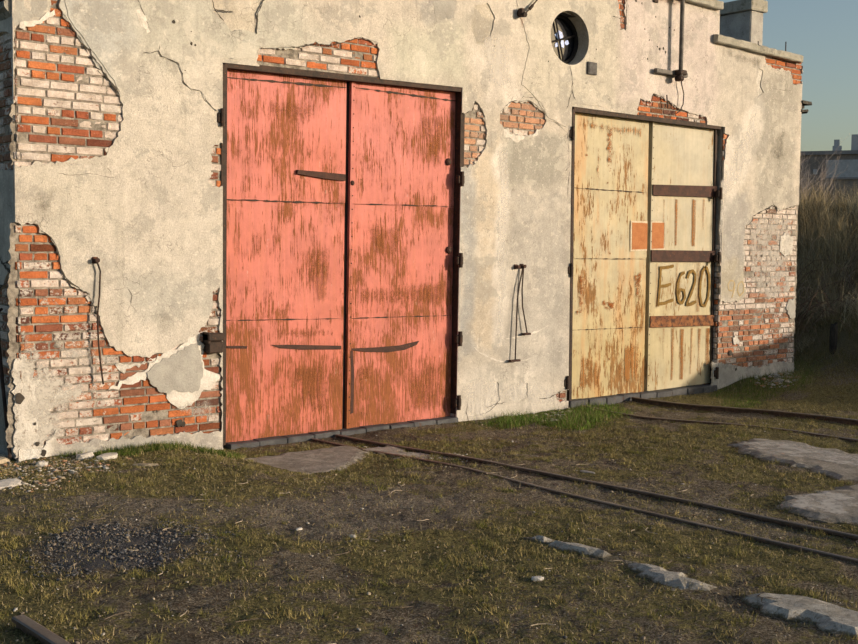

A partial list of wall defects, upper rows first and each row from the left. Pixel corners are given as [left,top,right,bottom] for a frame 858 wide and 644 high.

flaking render [211,0,263,34]
flaking render [471,3,495,47]
flaking render [618,0,643,30]
flaking render [0,0,123,171]
crack [138,0,217,111]
flaking render [257,38,379,78]
flaking render [756,55,802,96]
flaking render [464,102,486,167]
flaking render [500,102,545,136]
flaking render [637,94,706,123]
flaking render [717,205,798,371]
flaking render [0,222,221,456]